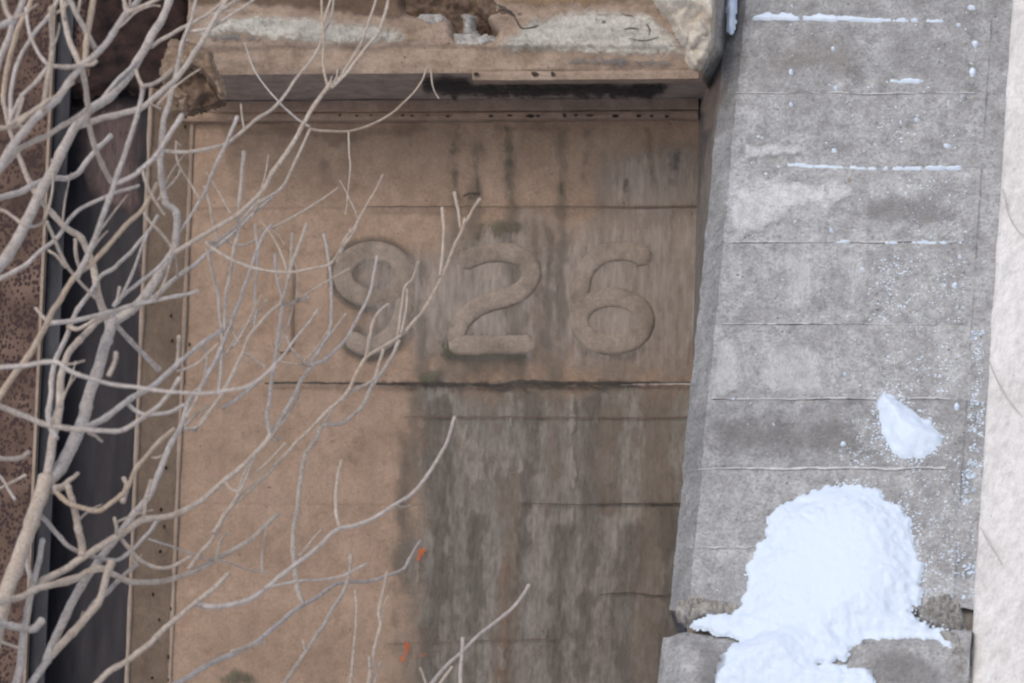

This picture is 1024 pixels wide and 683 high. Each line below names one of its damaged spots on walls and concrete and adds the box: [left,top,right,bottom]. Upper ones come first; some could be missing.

spalling [158,15,408,129]
leakage [422,78,667,100]
peeling [404,0,727,84]
leakage [364,259,396,290]
leakage [404,149,698,375]
leakage [379,370,690,683]